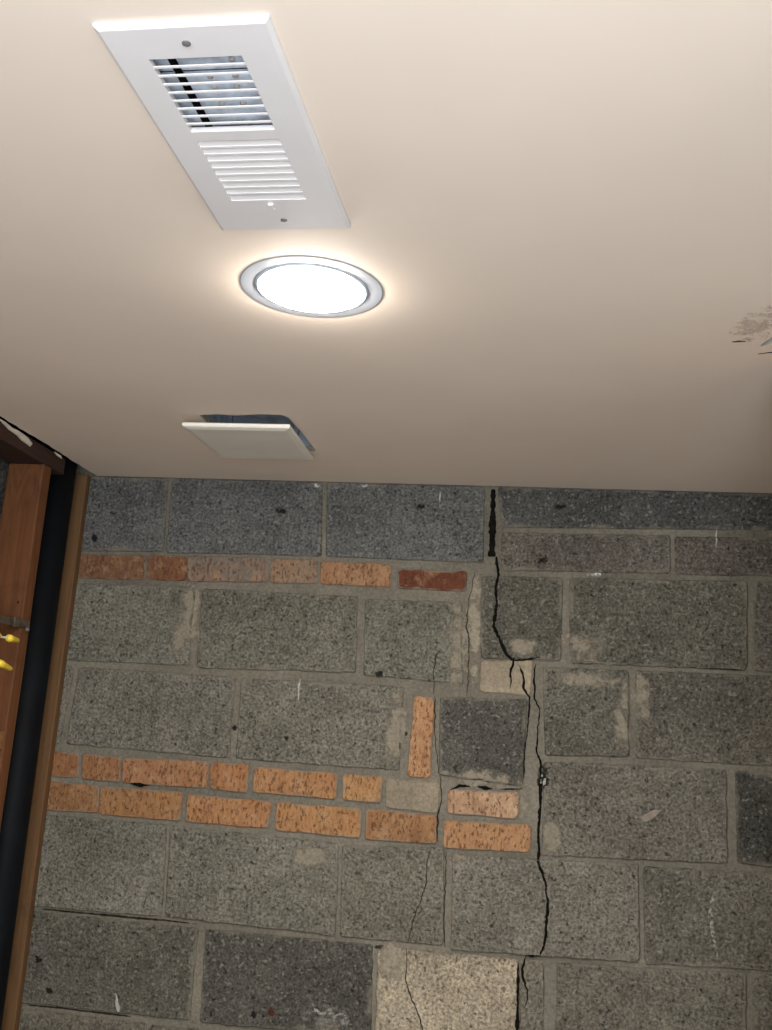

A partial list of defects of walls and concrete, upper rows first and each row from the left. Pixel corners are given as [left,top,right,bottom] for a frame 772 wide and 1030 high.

crack [405,649,447,1030]
crack [465,556,549,1008]